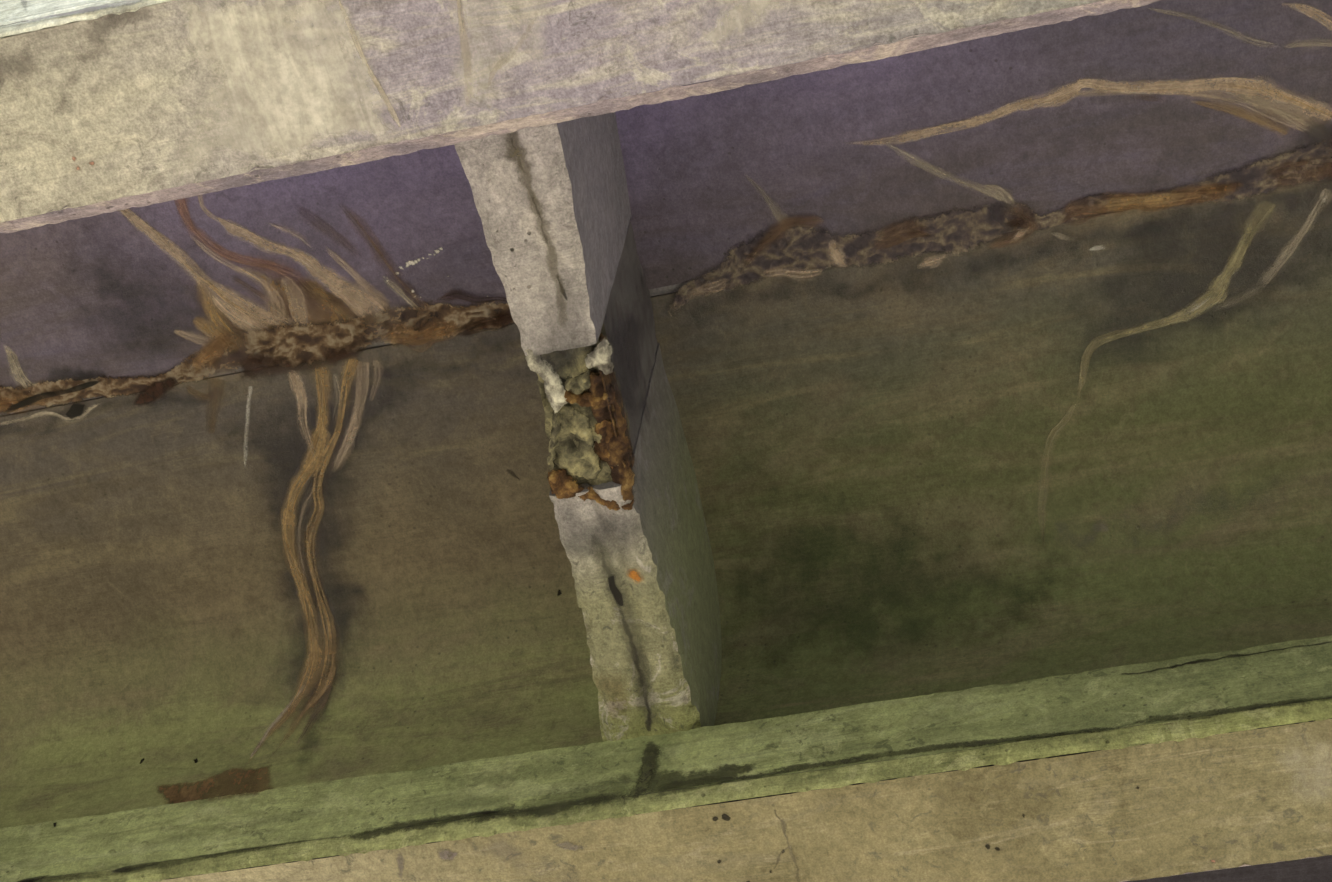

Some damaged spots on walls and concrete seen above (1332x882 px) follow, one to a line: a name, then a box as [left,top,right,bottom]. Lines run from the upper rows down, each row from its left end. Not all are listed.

corrosion [120,209,386,340]